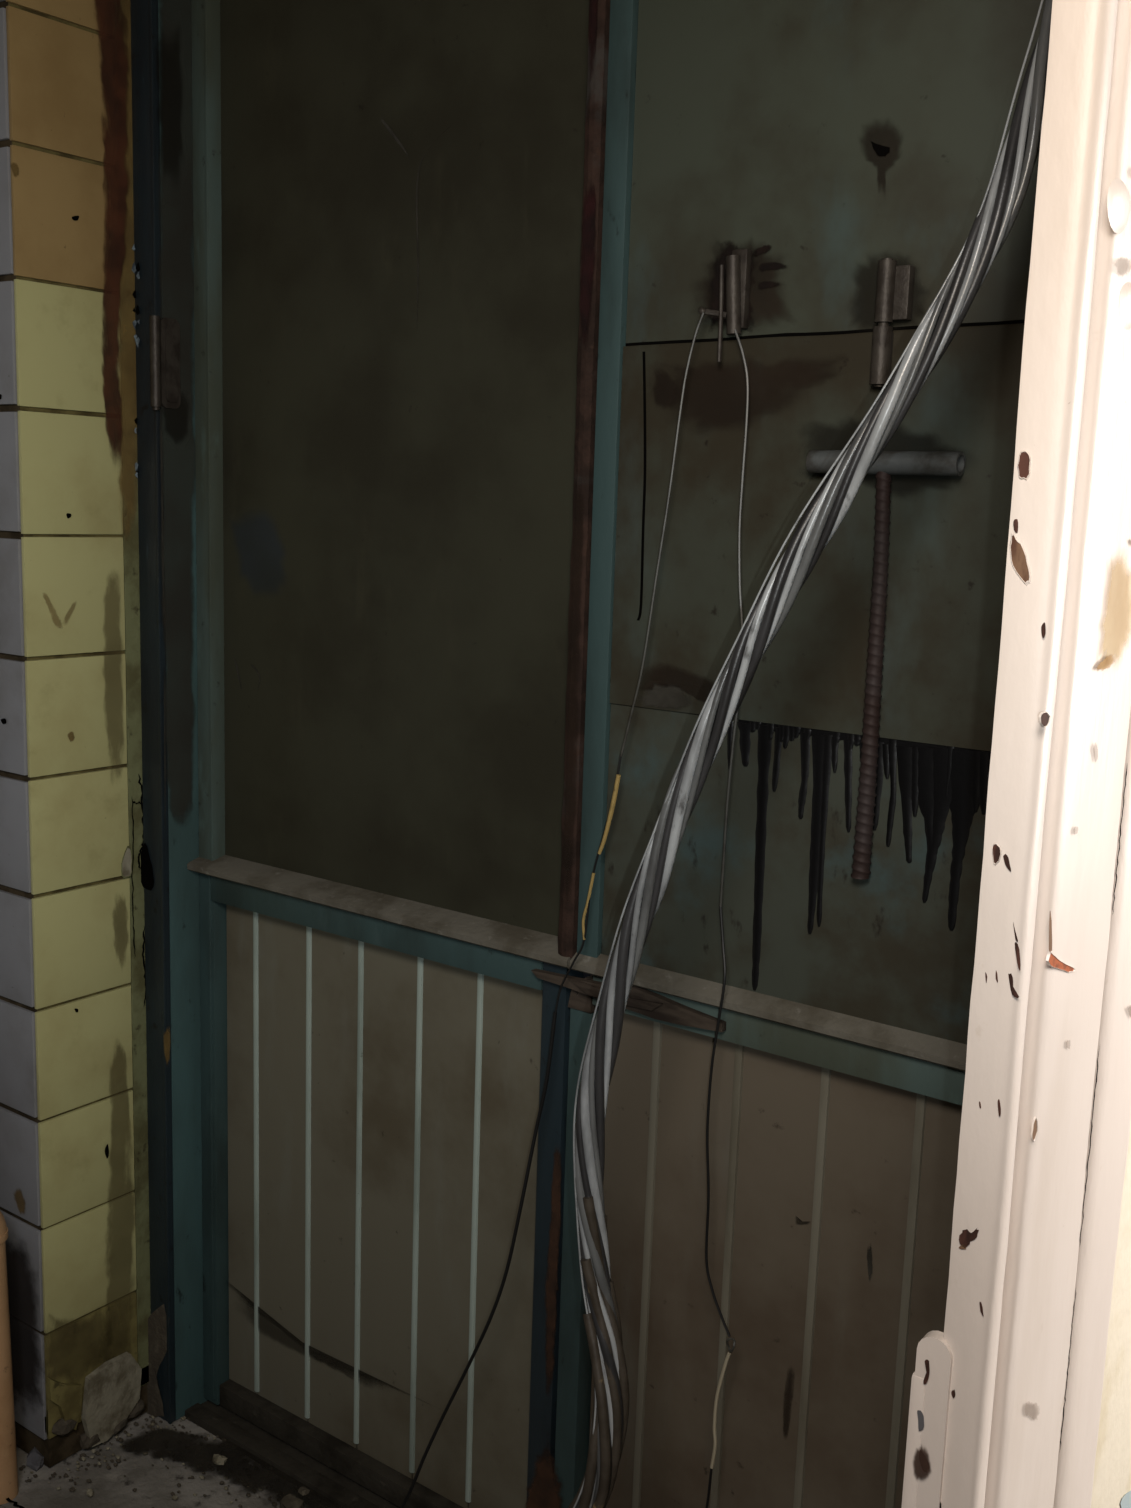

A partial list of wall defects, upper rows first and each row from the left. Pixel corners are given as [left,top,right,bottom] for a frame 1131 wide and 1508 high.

rust [865,127,899,186]
rust [95,0,137,531]
peeling [1017,450,1031,481]
peeling [1010,519,1031,586]
damp [1097,564,1131,670]
peeling [1039,712,1050,727]
damp [727,721,991,990]
peeling [992,843,1011,871]
peeling [985,923,1021,998]
peeling [1046,911,1075,973]